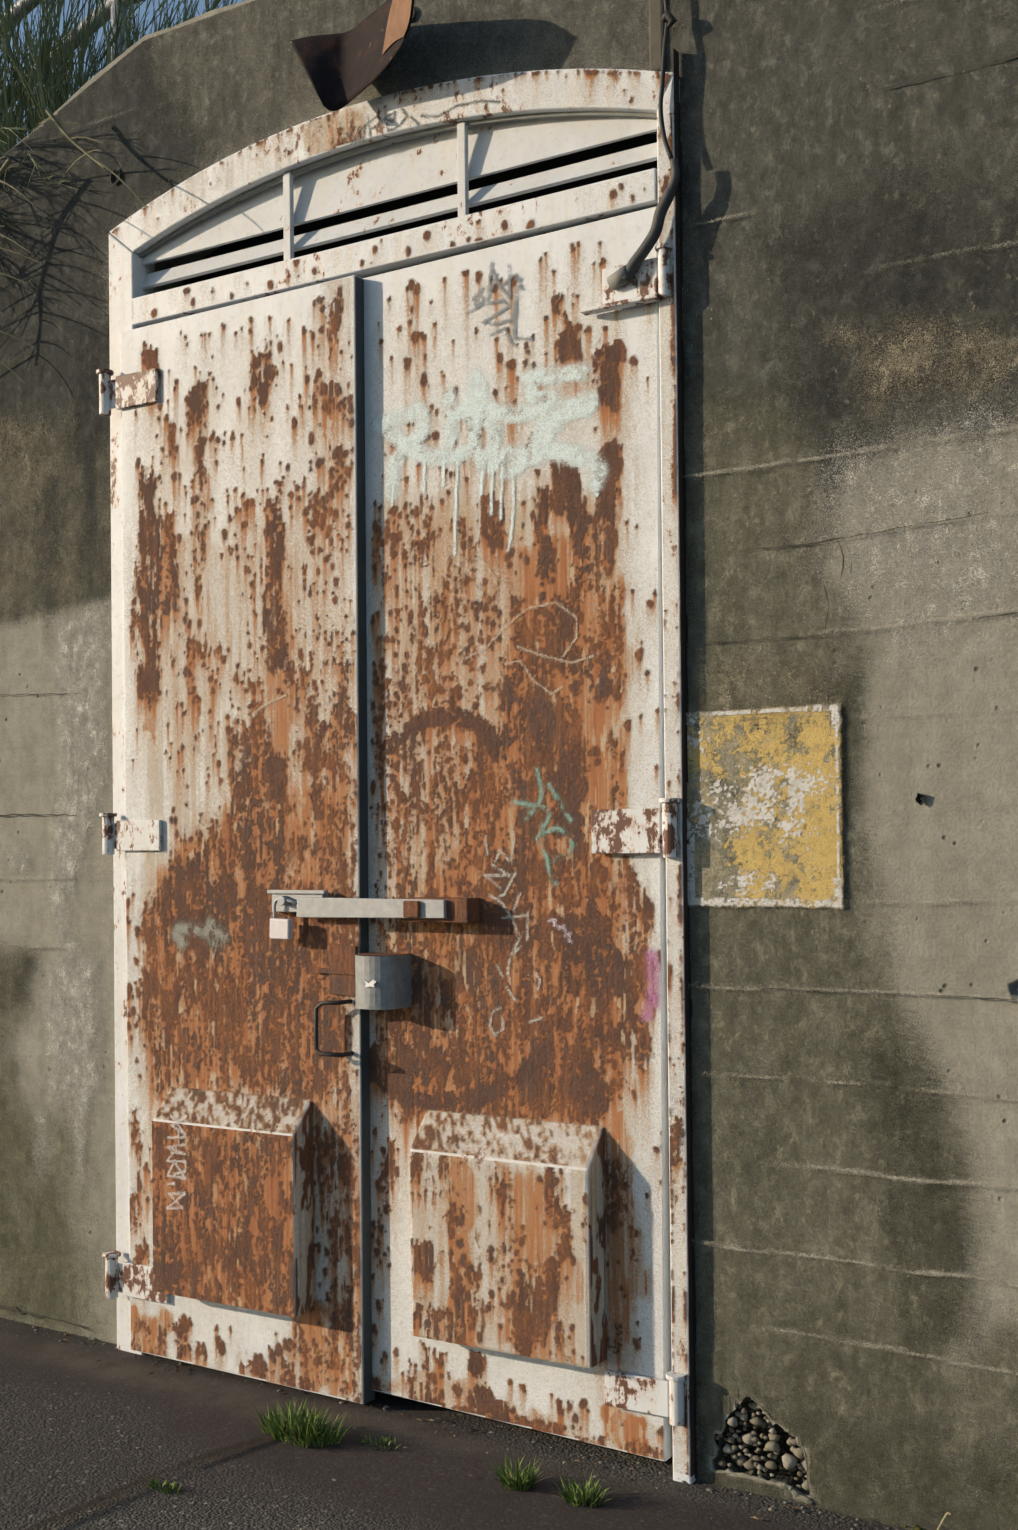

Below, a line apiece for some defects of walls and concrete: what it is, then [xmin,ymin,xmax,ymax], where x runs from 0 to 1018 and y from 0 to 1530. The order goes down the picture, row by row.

leakage [0,0,650,1336]
rust [382,0,412,54]
rust [123,48,695,1477]
spalling [713,1395,813,1504]
peeling [685,703,844,909]
leakage [666,0,1018,1530]